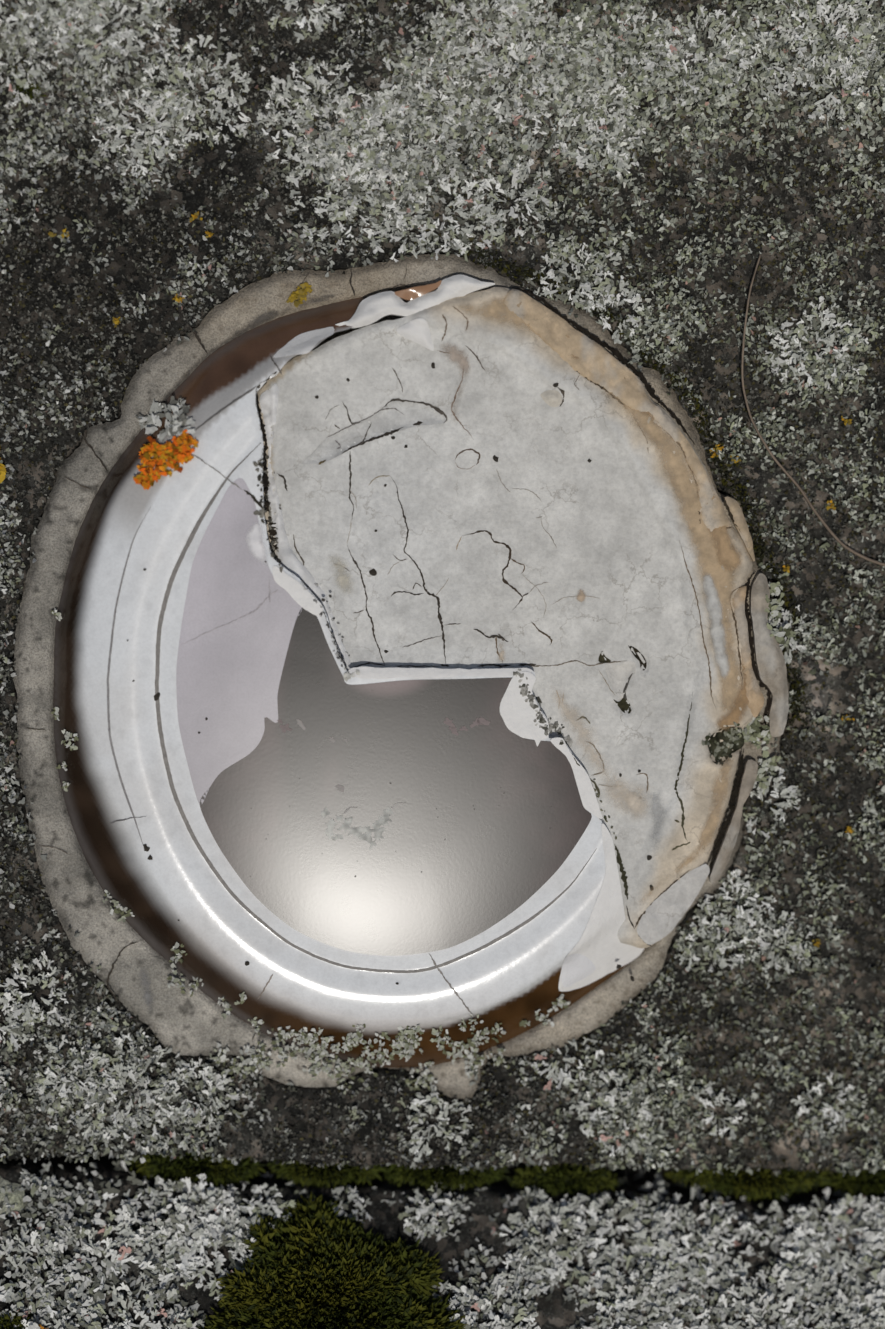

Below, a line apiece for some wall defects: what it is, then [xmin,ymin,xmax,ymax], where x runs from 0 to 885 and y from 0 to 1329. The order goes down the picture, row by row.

crack [190,327,208,354]
peeling [273,327,334,358]
spalling [302,398,447,465]
crack [440,306,557,548]
peeling [504,289,755,561]
peeling [247,524,332,616]
crack [182,356,745,946]
spalling [598,645,647,714]
leakage [704,576,729,676]
peeling [732,586,764,718]
peeling [321,803,404,850]
peeling [500,672,710,992]